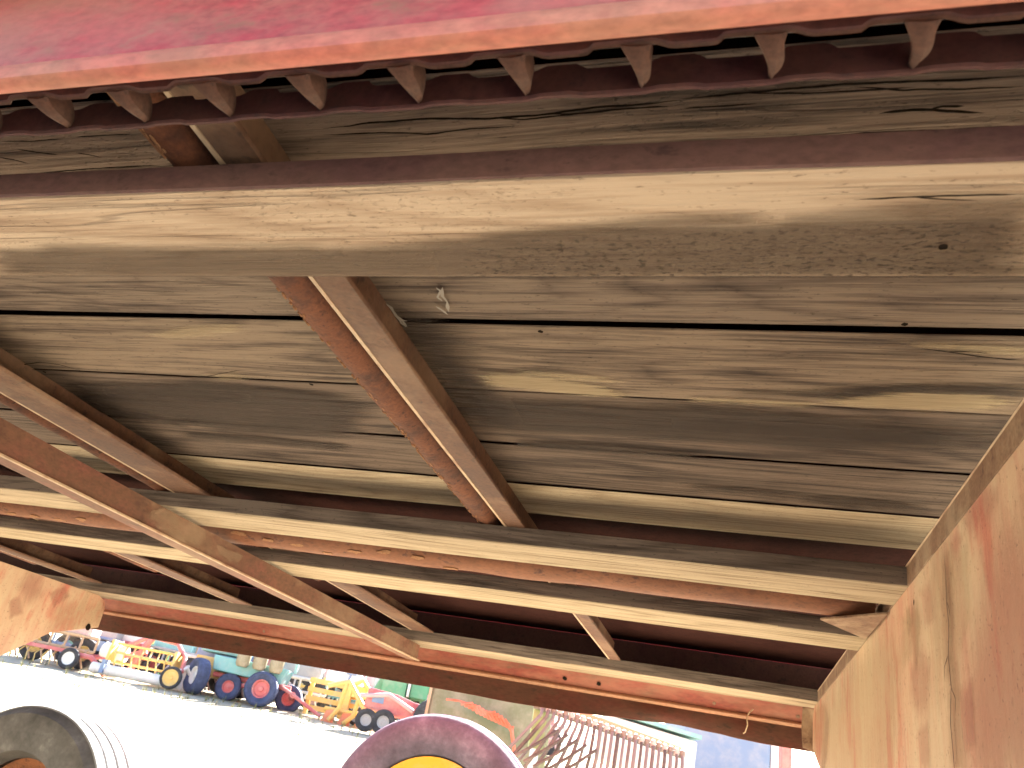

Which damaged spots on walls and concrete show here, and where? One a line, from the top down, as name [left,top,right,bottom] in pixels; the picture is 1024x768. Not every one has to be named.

crack [324,76,1024,135]